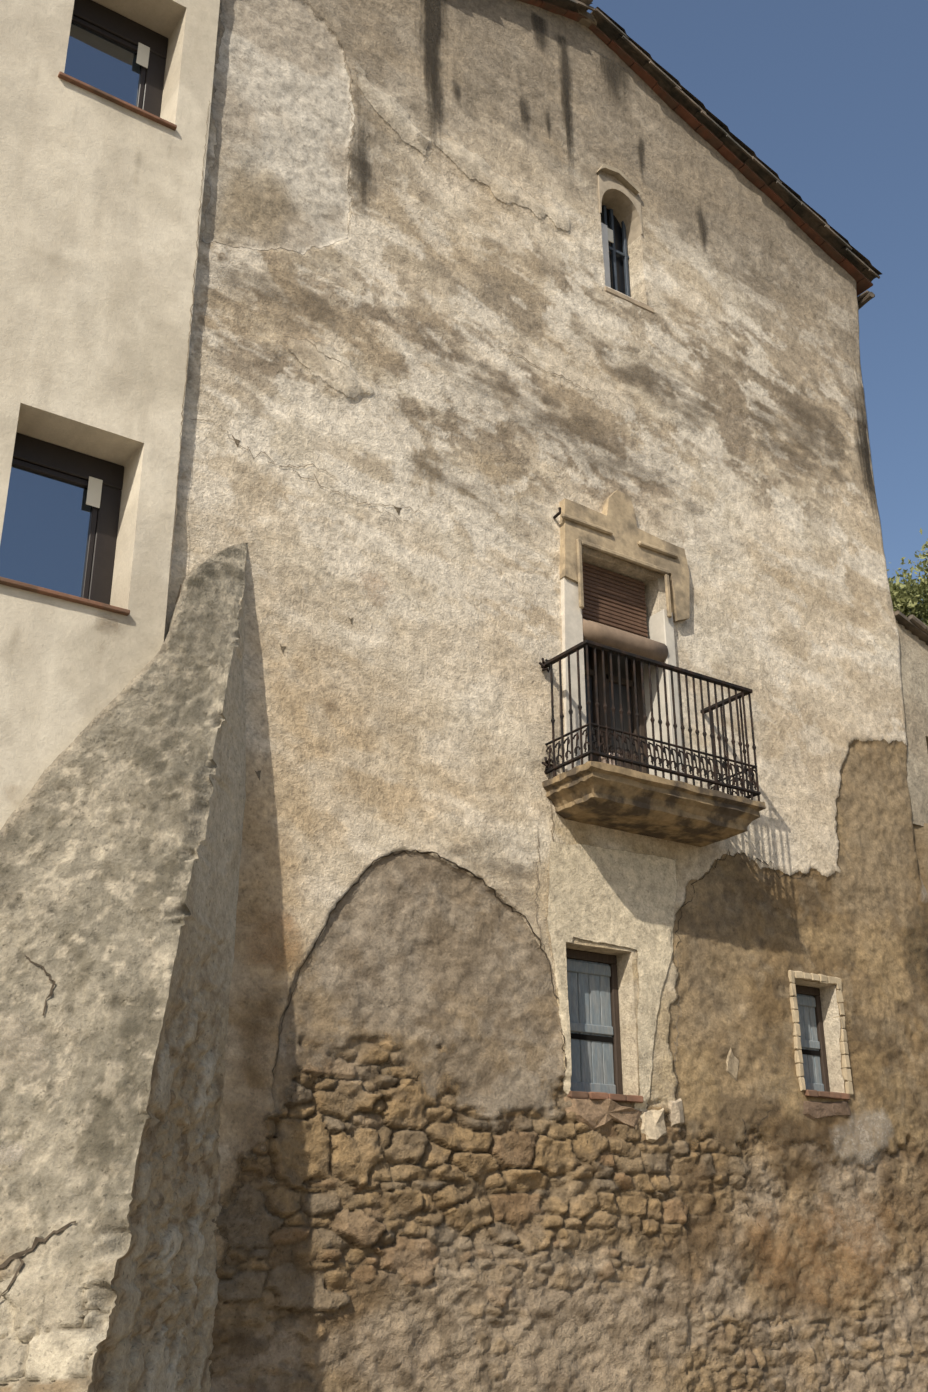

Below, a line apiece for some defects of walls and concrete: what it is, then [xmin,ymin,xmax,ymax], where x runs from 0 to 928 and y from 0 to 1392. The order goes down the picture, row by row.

water stain [420,0,460,124]
water stain [520,98,529,121]
water stain [533,13,572,139]
water stain [351,138,370,199]
water stain [698,213,706,246]
flaking render [208,739,928,1392]
crack [0,1221,76,1298]